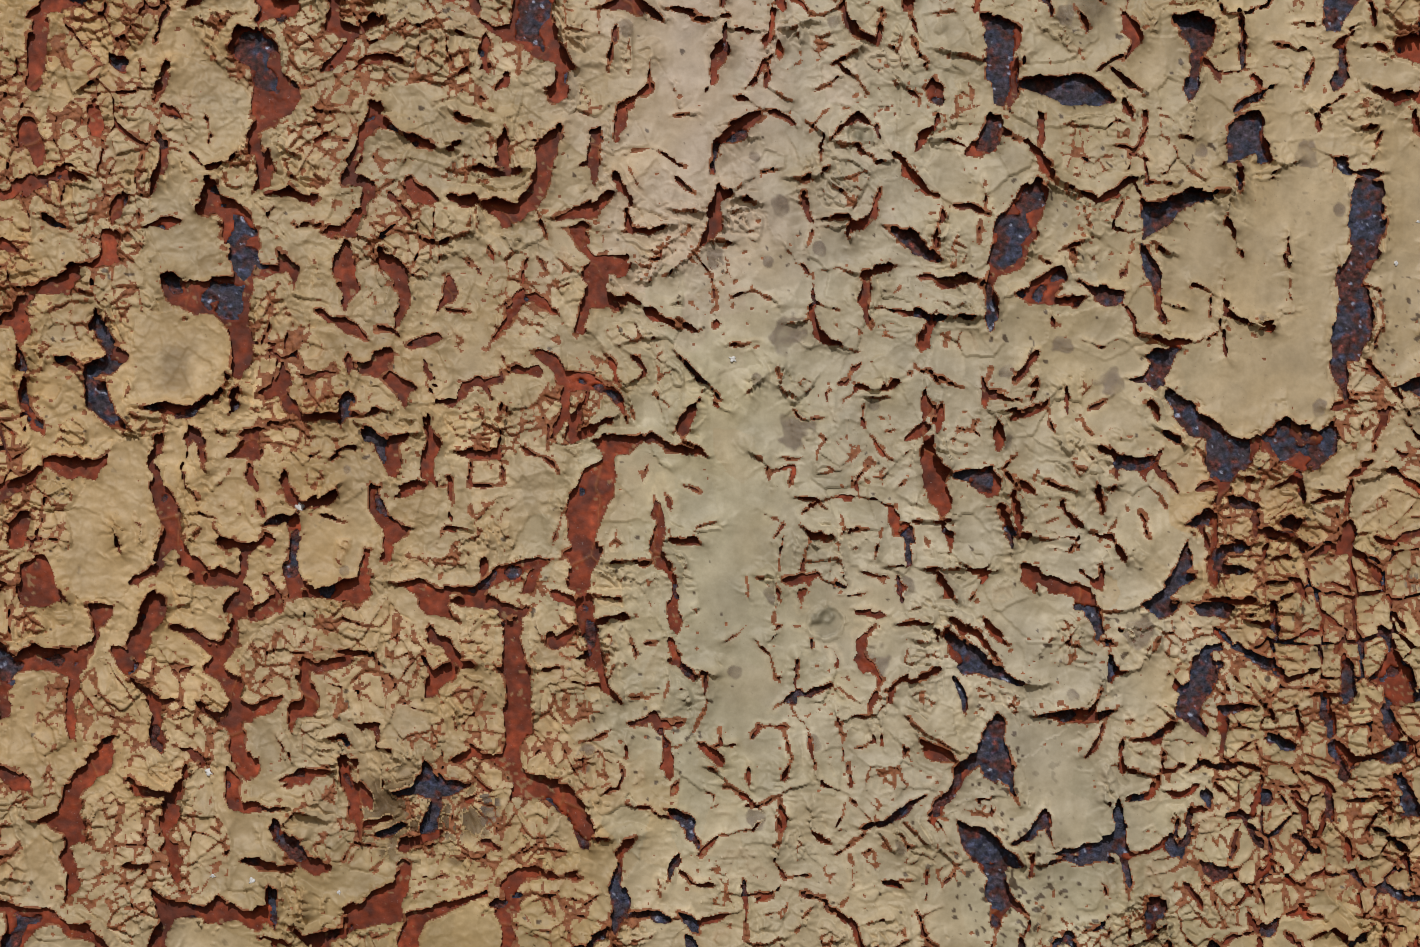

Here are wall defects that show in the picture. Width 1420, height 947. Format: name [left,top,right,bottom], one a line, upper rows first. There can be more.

peeling [145,55,287,282]
rust [142,19,312,349]
rust [317,0,409,76]
peeling [906,0,1122,161]
peeling [1033,0,1420,439]
rust [878,168,1393,512]
crack [0,423,59,633]
crack [65,679,115,744]
peeling [0,238,456,947]
peeling [410,340,731,858]
rust [573,592,629,712]
peeling [886,669,1146,898]